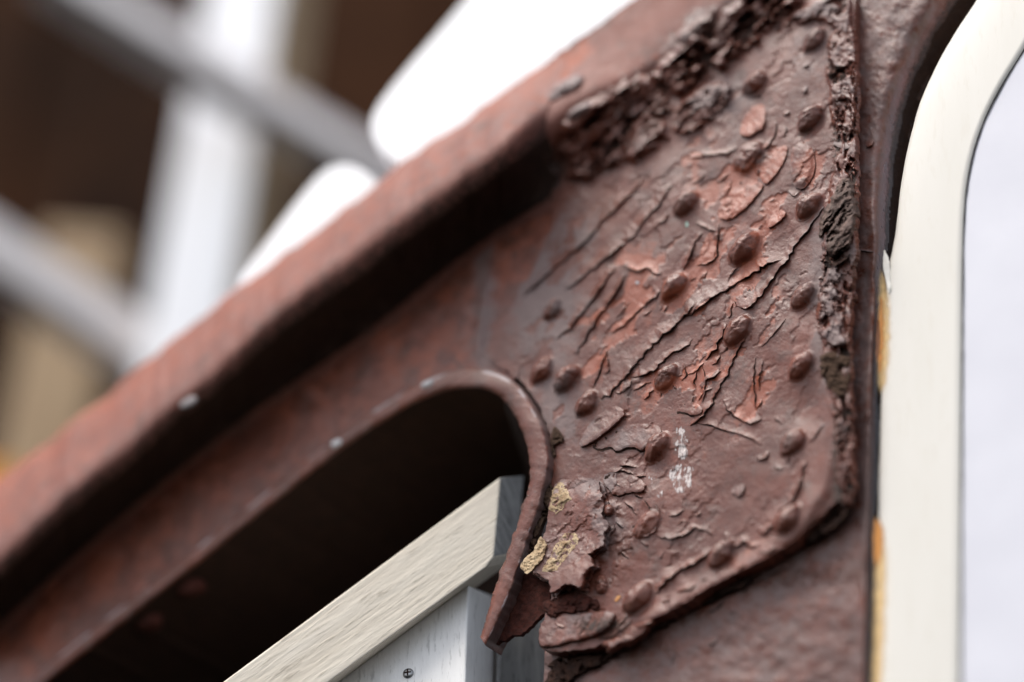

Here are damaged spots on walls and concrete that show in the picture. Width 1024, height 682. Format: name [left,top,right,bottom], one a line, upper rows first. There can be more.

peeling [740,104,766,139]
peeling [718,142,816,221]
peeling [767,208,787,229]
peeling [698,232,717,264]
peeling [739,284,760,310]
crack [517,63,825,613]
corrosion [875,276,889,388]
peeling [579,406,662,453]
peeling [676,401,703,417]
peeling [530,472,646,597]
corrosion [873,519,885,682]
peeling [539,611,616,649]